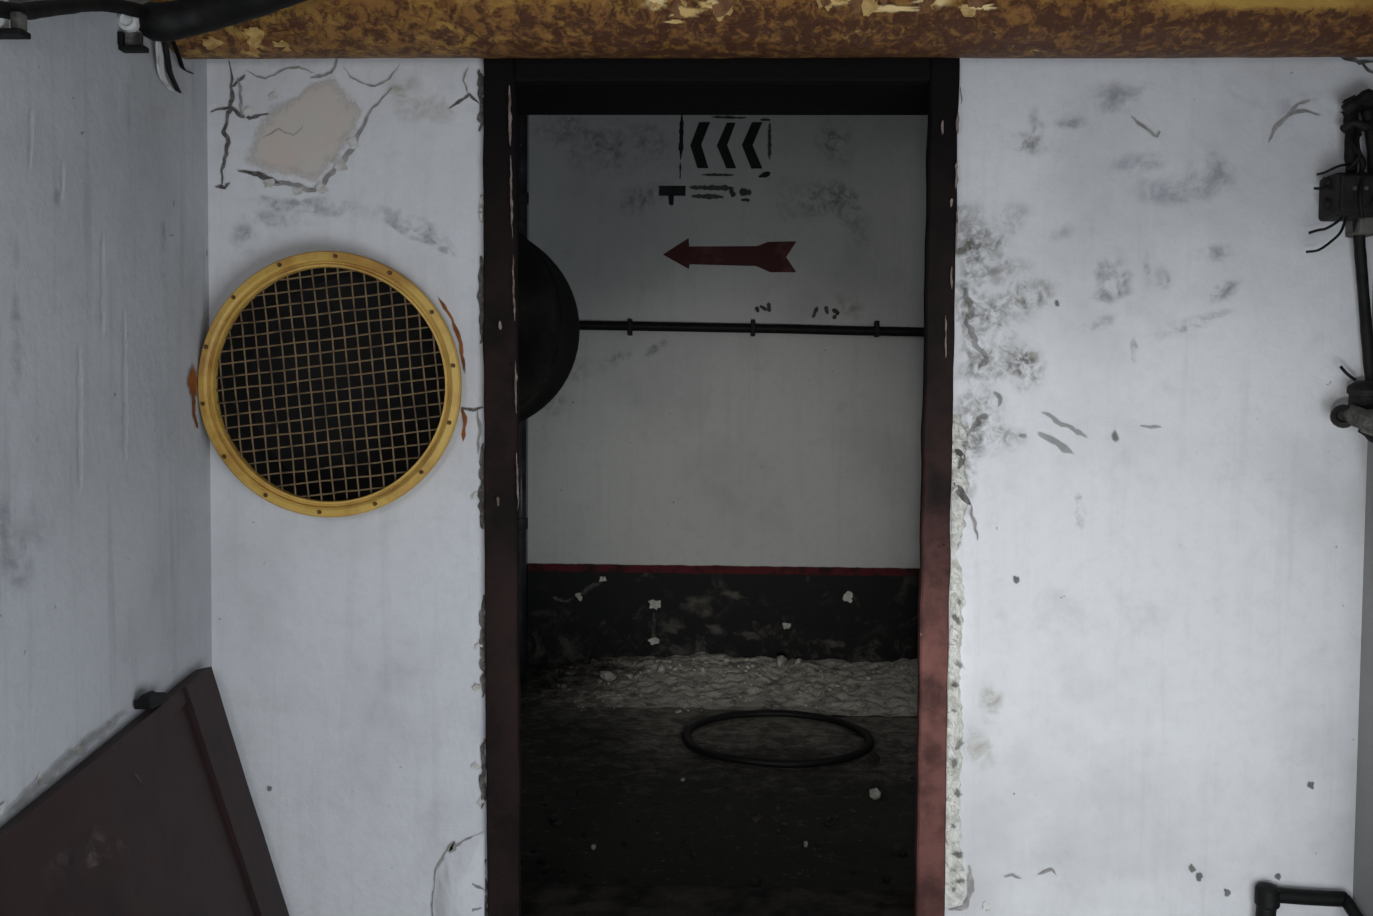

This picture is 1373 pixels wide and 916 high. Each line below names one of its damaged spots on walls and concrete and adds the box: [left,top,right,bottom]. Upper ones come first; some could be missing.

crack [211,61,268,189]
peeling [202,27,400,196]
corrosion [439,299,465,371]
flaking render [945,414,993,912]